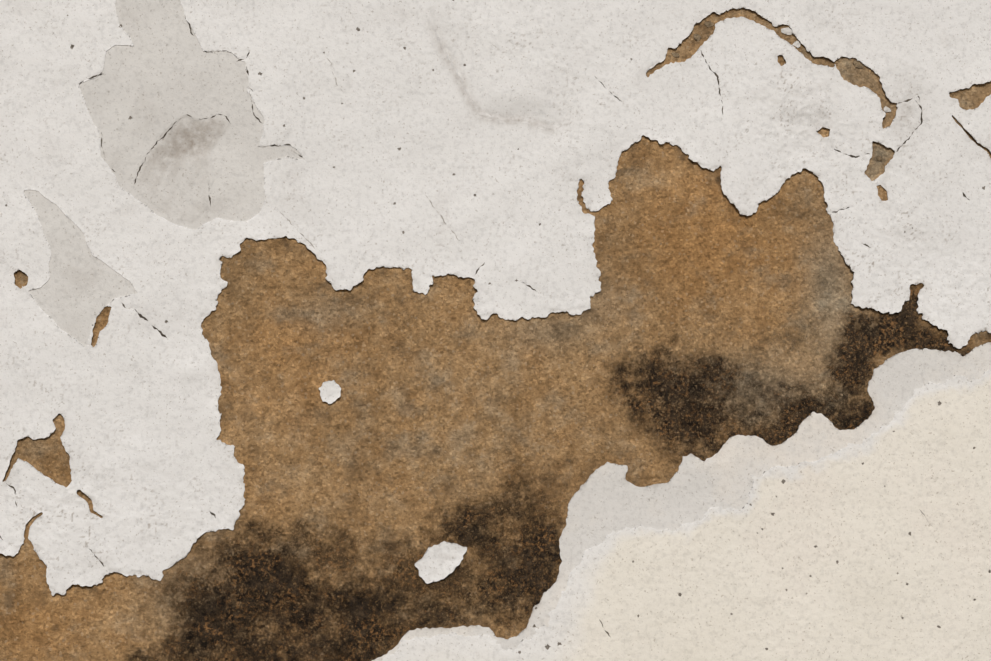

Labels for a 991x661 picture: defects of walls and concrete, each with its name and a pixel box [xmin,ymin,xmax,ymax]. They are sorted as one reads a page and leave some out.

peeling [645,17,880,216]
spalling [949,81,991,160]
peeling [0,135,991,661]
leakage [610,287,972,461]
leakage [157,466,562,661]